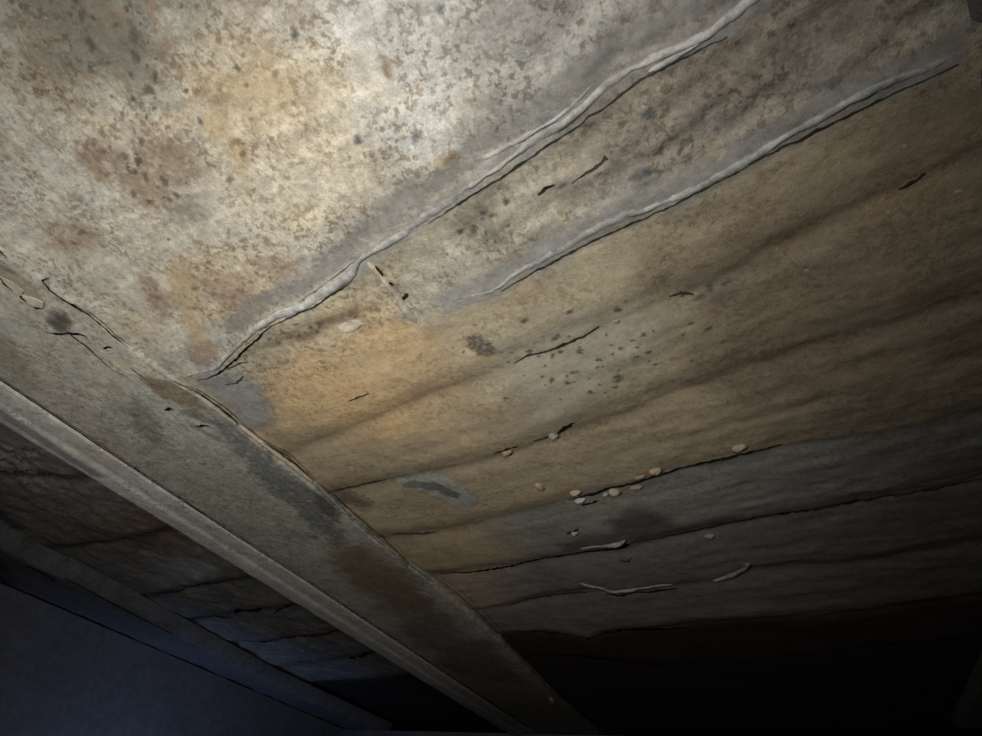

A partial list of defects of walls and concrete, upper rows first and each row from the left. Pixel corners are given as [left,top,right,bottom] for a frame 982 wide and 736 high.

damp [501,298,669,425]
damp [211,380,345,545]
damp [391,471,477,510]
crack [0,276,982,727]